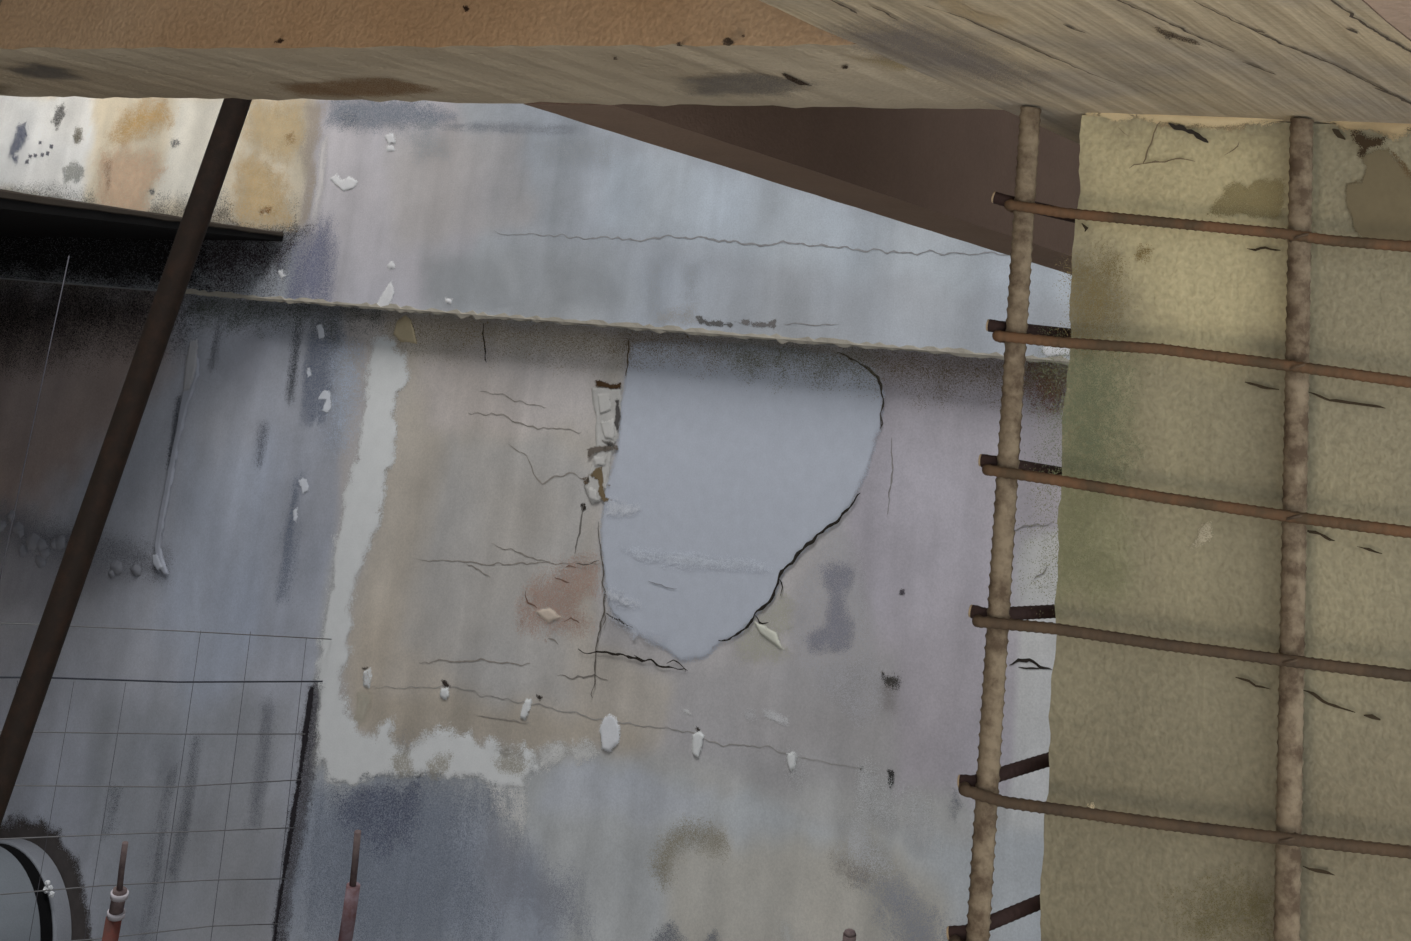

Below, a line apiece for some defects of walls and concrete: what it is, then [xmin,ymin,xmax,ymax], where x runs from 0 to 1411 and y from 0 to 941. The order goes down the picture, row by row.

crack [1118,121,1240,168]
crack [497,232,1006,256]
spalling [583,380,622,505]
crack [372,322,894,774]
flaking render [754,621,784,650]
leakage [803,558,859,657]
leakage [274,762,598,941]
leakage [827,755,967,941]